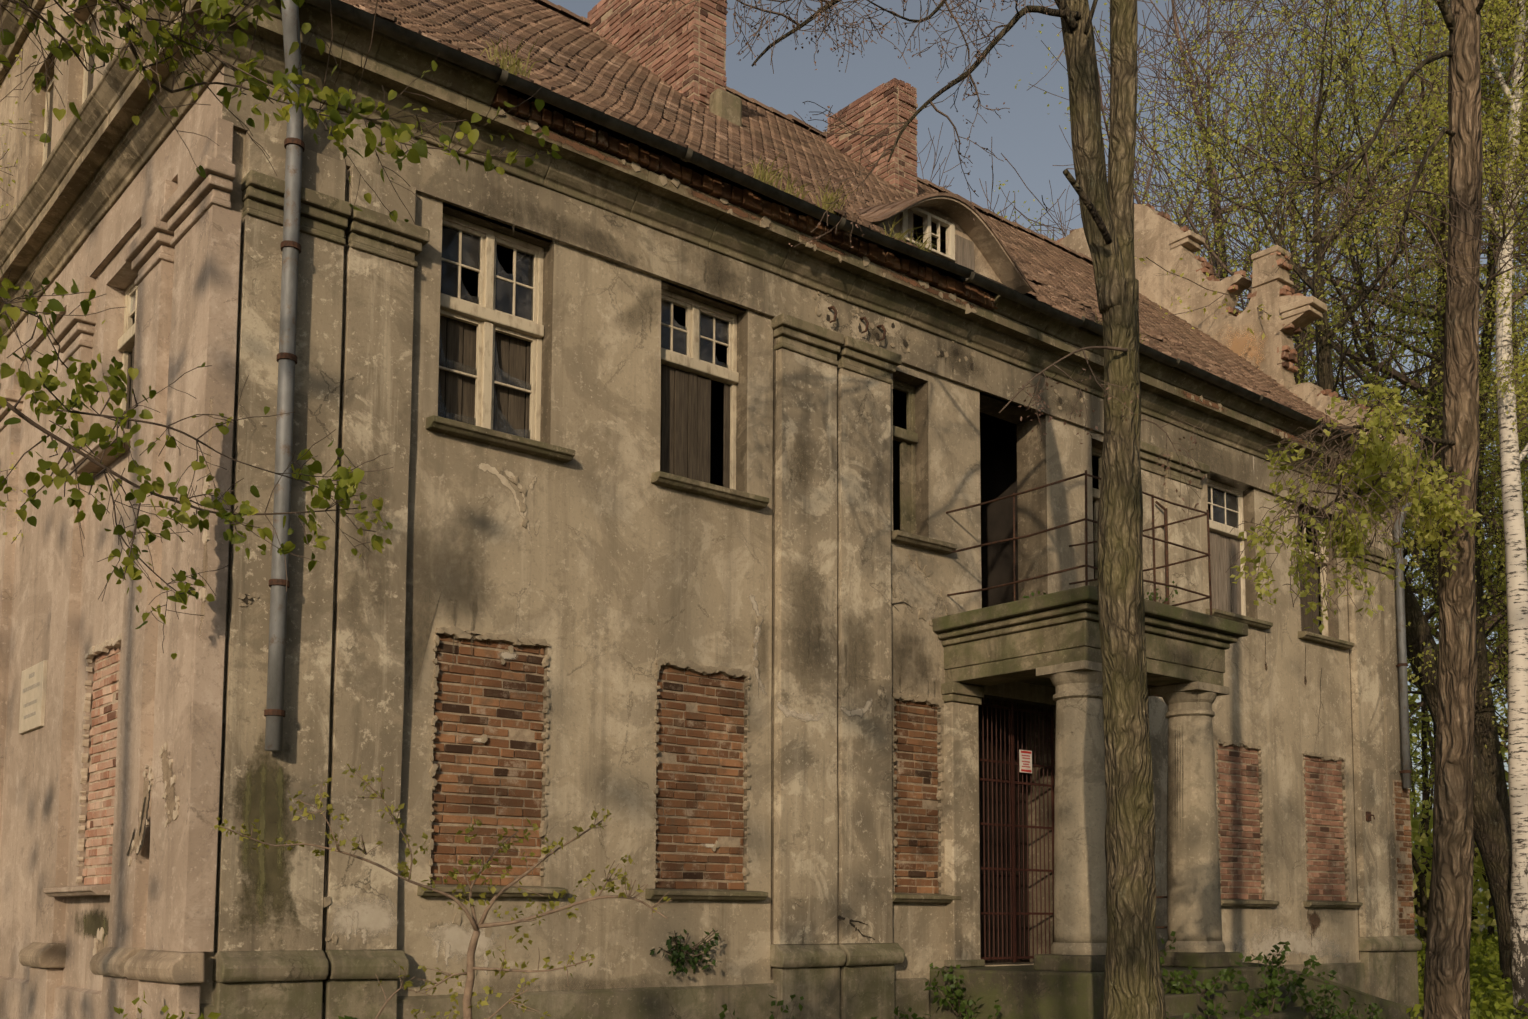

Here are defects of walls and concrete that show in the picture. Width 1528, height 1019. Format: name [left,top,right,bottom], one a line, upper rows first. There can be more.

flaking render [478,463,537,532]
leakage [235,739,297,926]